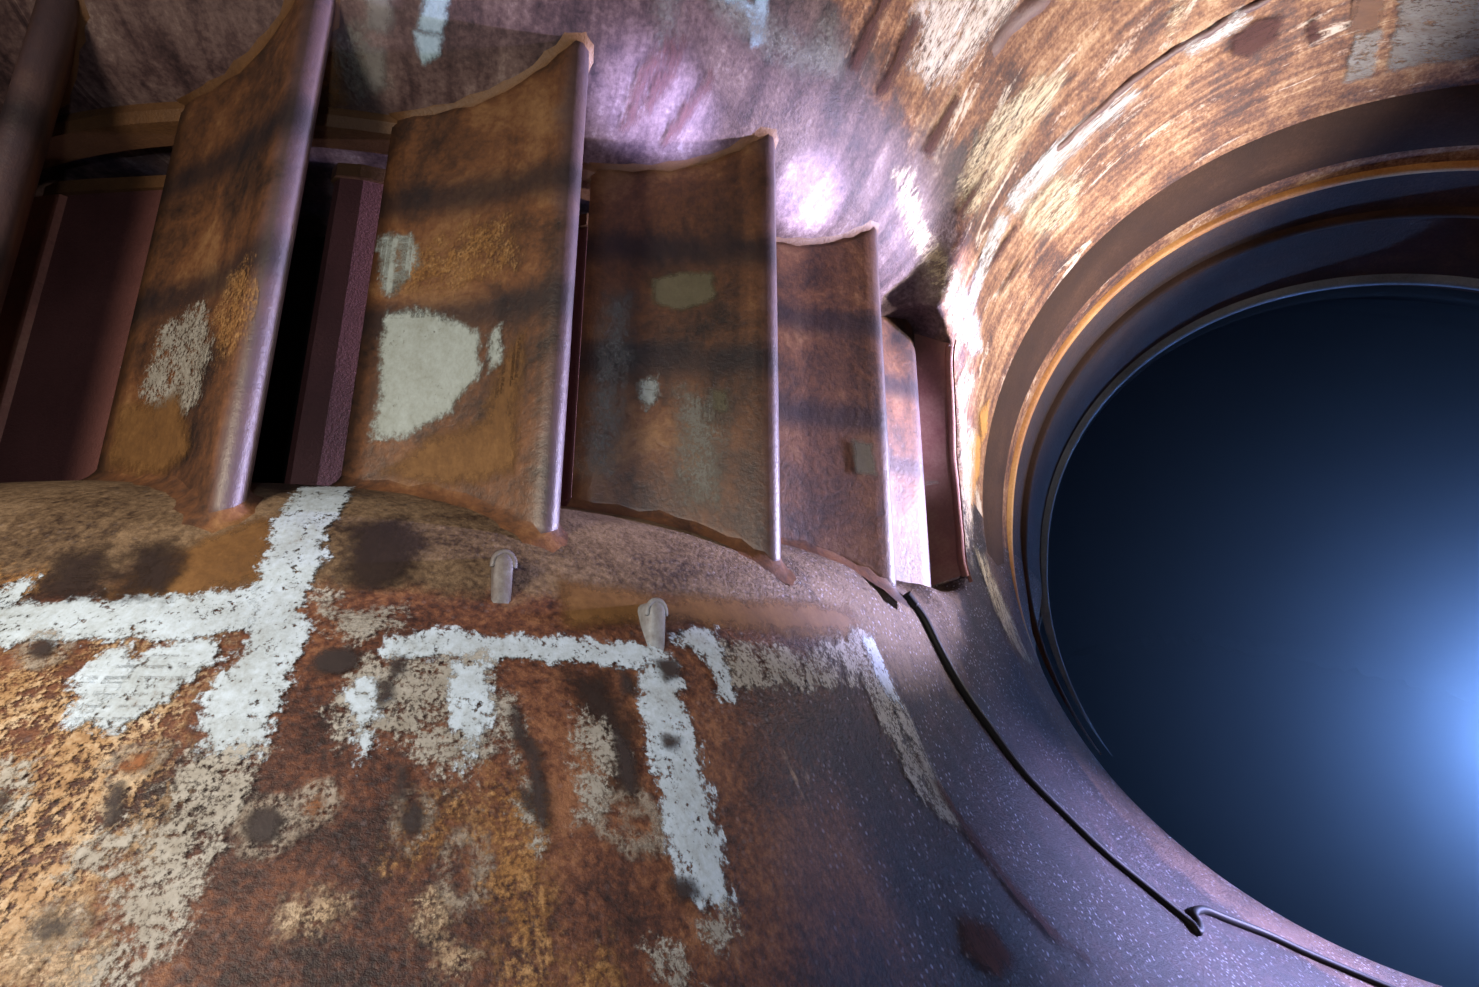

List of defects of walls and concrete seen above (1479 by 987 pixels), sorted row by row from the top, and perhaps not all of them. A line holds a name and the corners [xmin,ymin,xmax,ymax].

corrosion [1230,16,1283,59]
peeling [1388,0,1479,71]
corrosion [924,87,962,157]
corrosion [984,226,1023,295]
peeling [139,300,215,416]
peeling [370,233,503,441]
corrosion [107,518,278,599]
corrosion [560,580,860,637]
peeling [0,486,962,987]
corrosion [566,669,637,797]
corrosion [0,631,210,987]
corrosion [382,691,559,987]